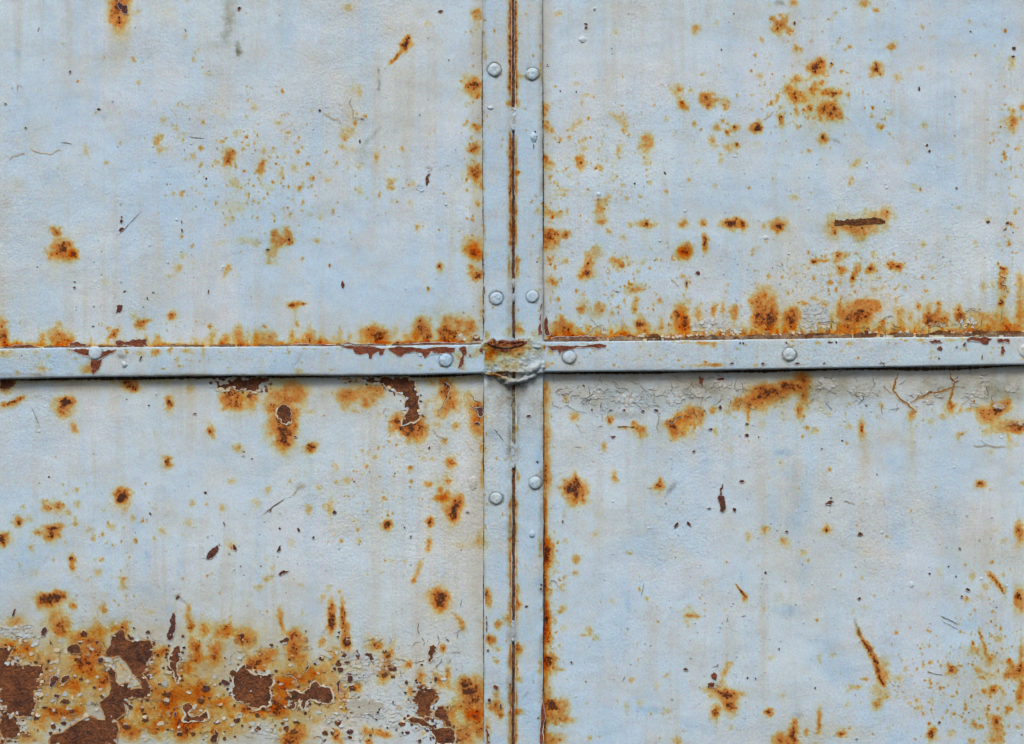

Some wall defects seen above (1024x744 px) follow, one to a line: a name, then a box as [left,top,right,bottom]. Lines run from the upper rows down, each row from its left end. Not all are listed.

rust [396,319,457,343]
rust [754,301,795,332]
rust [270,397,297,446]
peeling [338,375,424,430]
rust [393,418,423,436]
rust [737,379,805,406]
crack [543,365,1022,487]
rust [328,604,347,647]
rust [72,640,108,687]
peeling [0,595,460,744]
rust [458,679,483,741]